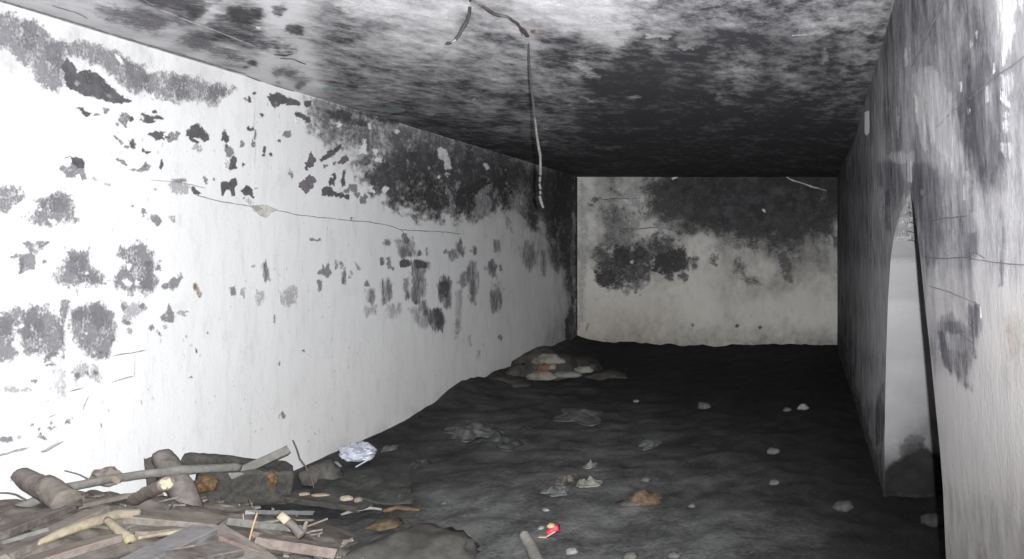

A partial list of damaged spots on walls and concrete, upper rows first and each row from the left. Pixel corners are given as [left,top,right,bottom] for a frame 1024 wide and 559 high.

damp [0,11,236,106]
damp [97,6,249,62]
peeling [273,7,302,35]
damp [987,0,1024,107]
peeling [60,57,277,217]
peeling [244,68,312,142]
damp [326,110,381,127]
peeling [289,119,422,204]
crack [155,180,459,240]
damp [594,207,688,287]
damp [940,305,979,378]